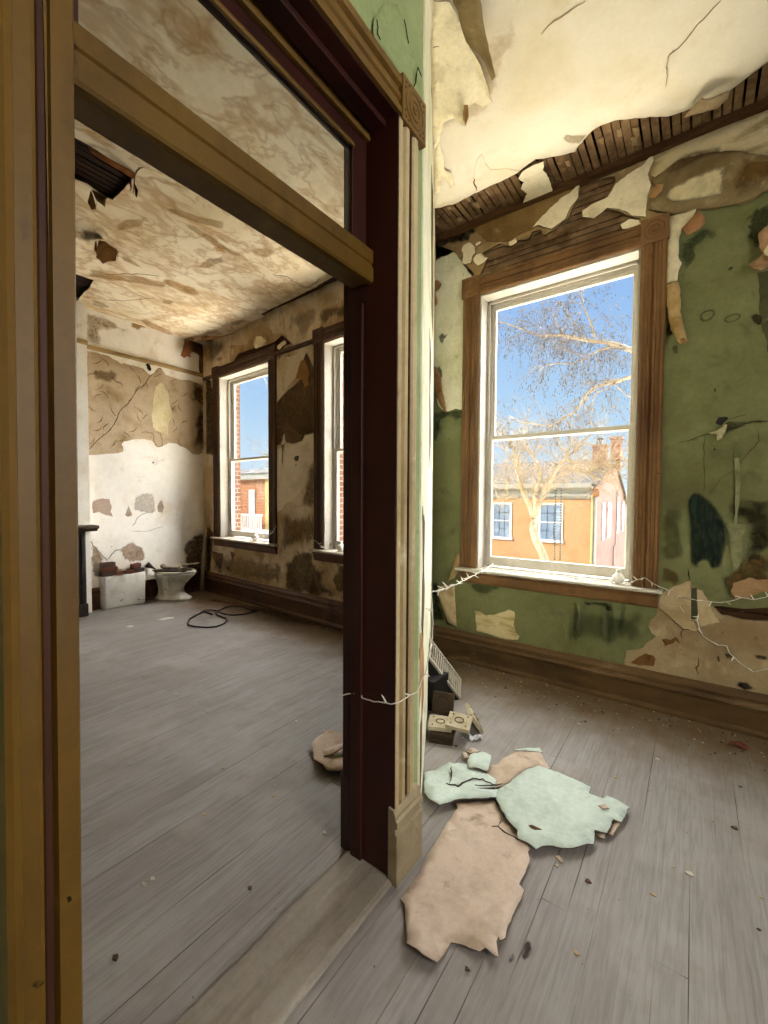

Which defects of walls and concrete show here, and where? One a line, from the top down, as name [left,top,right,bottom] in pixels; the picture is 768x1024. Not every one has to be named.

crack [541,1,586,35]
crack [666,1,721,83]
peeling [429,0,768,457]
crack [89,368,170,449]
crack [682,415,766,494]
flaking render [92,498,132,517]
flaking render [624,577,768,695]
peeling [419,506,630,850]